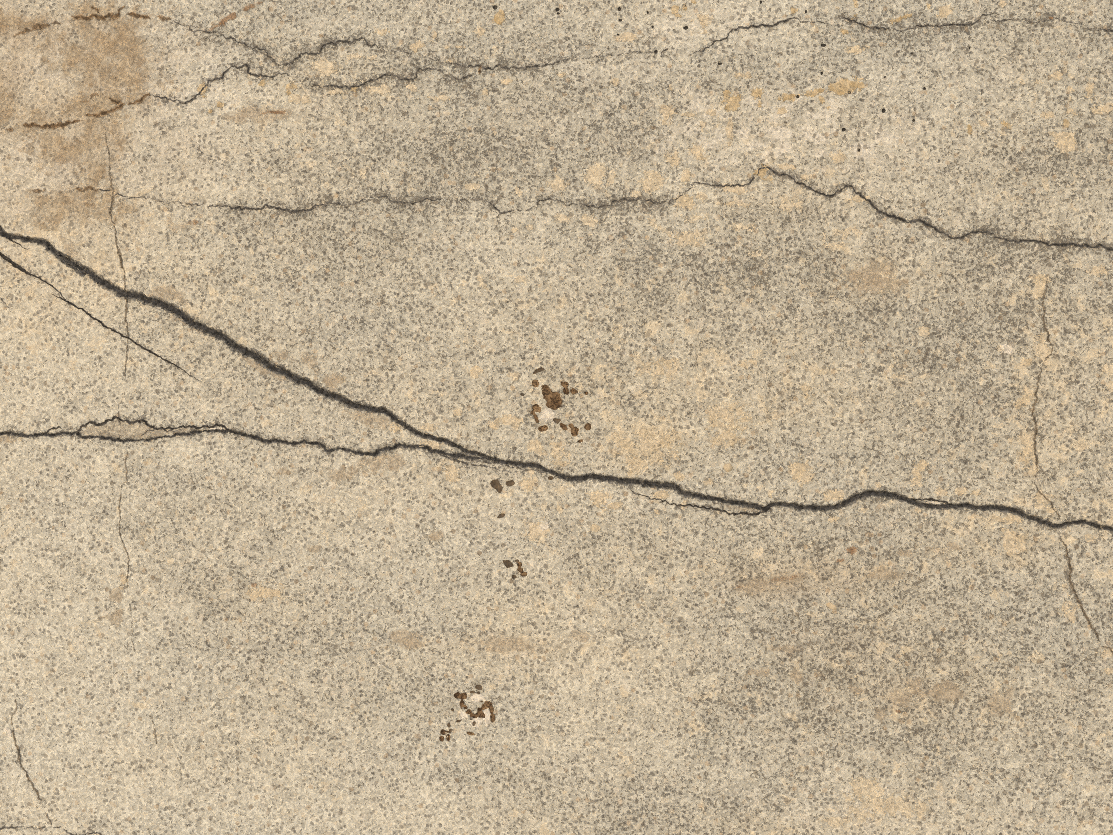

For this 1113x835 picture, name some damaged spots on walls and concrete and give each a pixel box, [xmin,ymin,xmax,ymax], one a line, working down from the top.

crack [153,20,667,104]
crack [695,13,1113,52]
crack [0,130,1113,654]